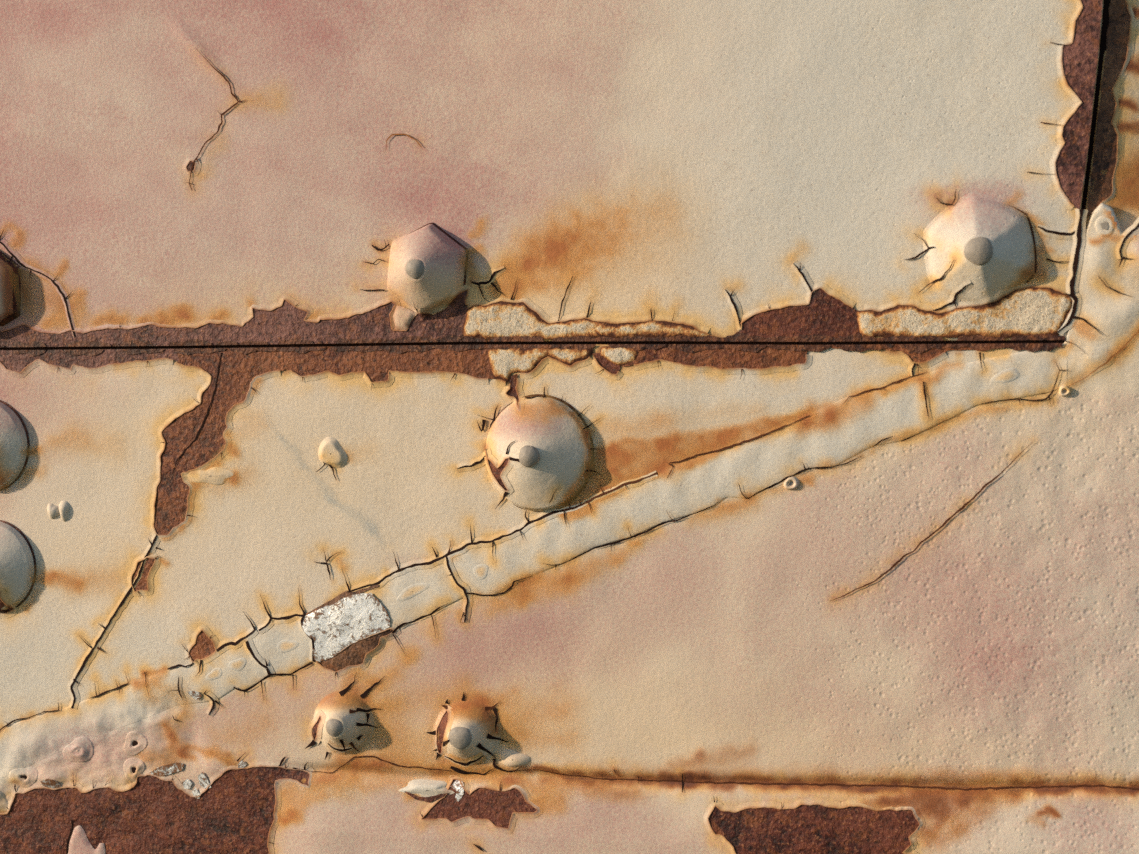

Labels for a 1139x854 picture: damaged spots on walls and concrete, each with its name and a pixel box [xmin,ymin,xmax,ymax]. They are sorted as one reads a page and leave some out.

crack [186,52,245,190]
corrosion [1050,0,1139,244]
crack [0,229,77,337]
crack [172,353,222,485]
corrosion [0,205,1065,597]
crack [316,209,1139,656]
crack [0,534,316,730]
corrosion [184,624,220,667]
corrosion [305,585,379,616]
corrosion [313,623,401,709]
corrosion [0,692,1139,854]
crack [279,672,1139,802]